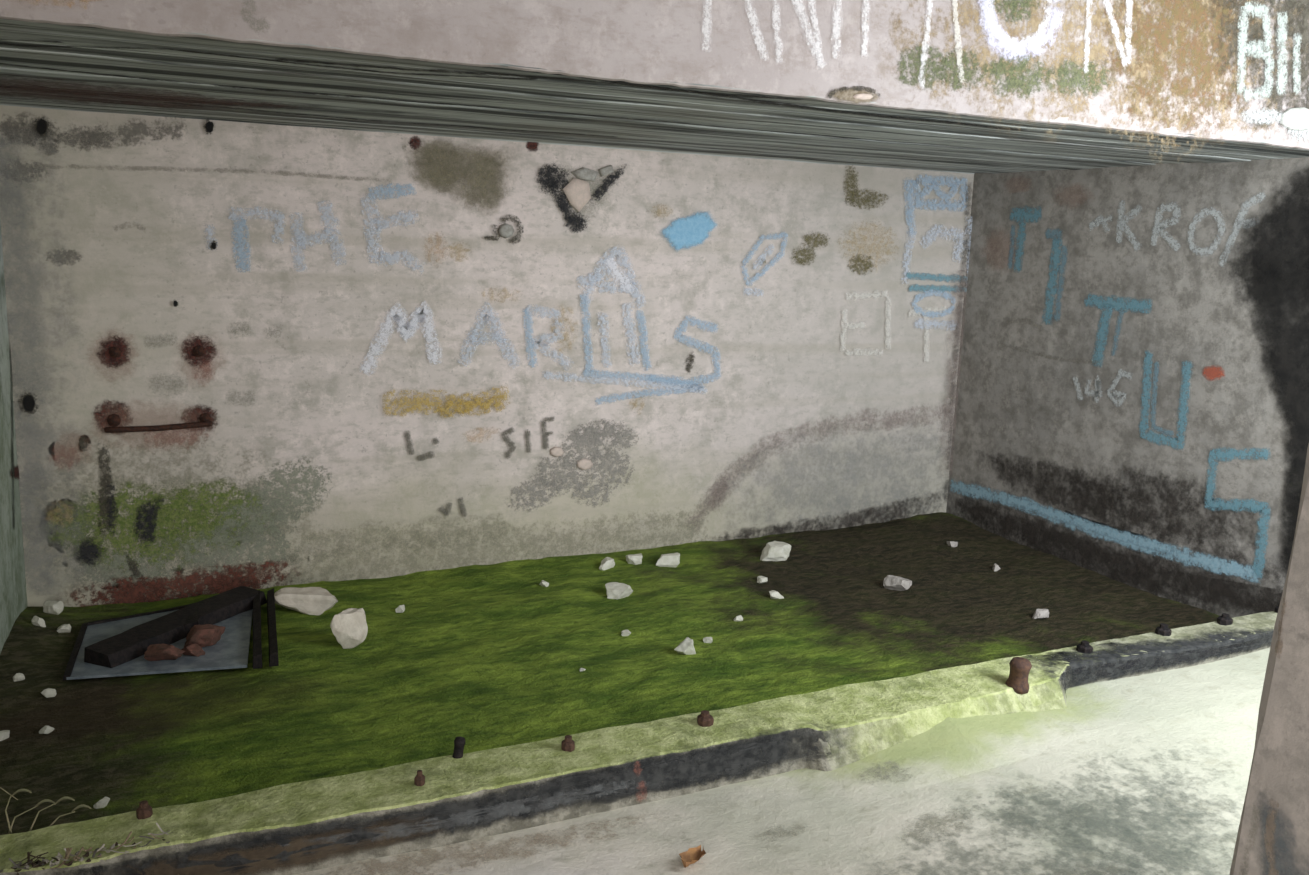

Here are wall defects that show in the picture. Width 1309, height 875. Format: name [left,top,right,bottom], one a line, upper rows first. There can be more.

damp [893,0,1309,142]
damp [409,136,503,205]
rust [97,336,130,367]
rust [182,336,216,367]
damp [958,168,1309,615]
rust [94,400,132,434]
rust [182,406,218,431]
damp [76,436,118,565]
damp [134,499,164,546]
rust [70,561,292,607]